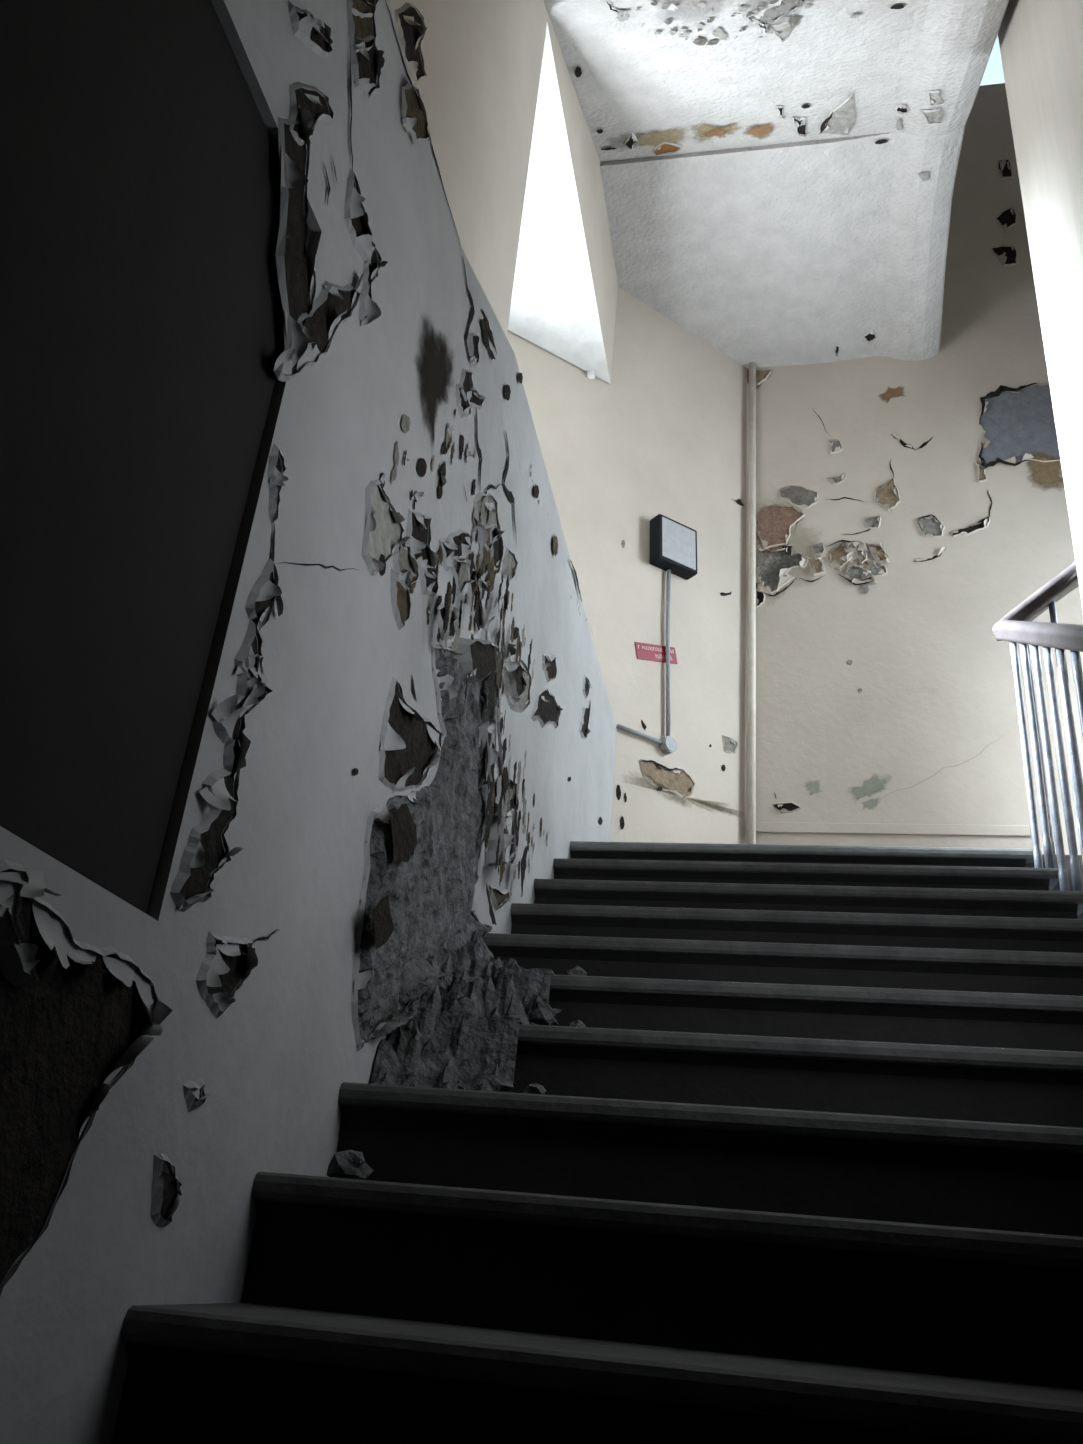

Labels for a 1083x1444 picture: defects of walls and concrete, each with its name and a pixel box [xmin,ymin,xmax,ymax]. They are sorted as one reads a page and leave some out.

peeling [394,2,428,85]
peeling [607,0,817,46]
peeling [775,91,857,137]
peeling [273,0,385,382]
flaking render [974,382,1064,488]
peeling [756,460,901,608]
peeling [170,444,288,912]
flaking render [351,408,563,1052]
peeling [638,759,695,800]
flaking render [196,929,278,1019]
flaking render [0,860,173,1296]
peeling [150,1149,182,1227]